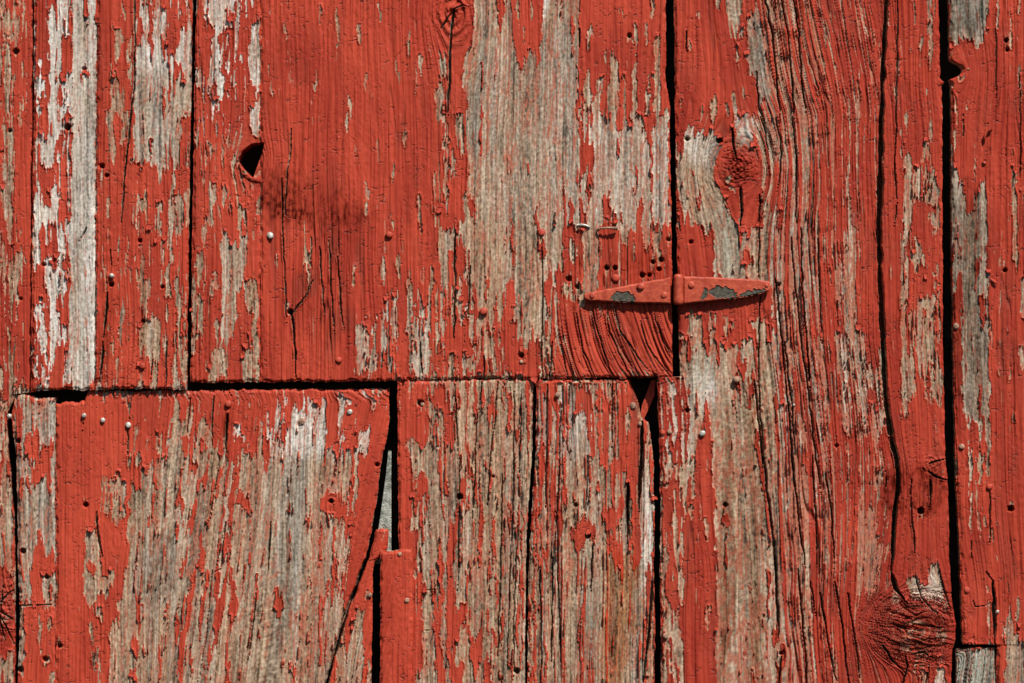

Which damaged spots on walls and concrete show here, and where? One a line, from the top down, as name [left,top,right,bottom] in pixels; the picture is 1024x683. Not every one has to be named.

peeling [0,0,262,391]
peeling [82,177,371,683]
crack [281,128,344,374]
peeling [354,0,992,683]
crack [876,0,996,683]
crack [995,33,1022,173]
peeling [1009,159,1022,272]